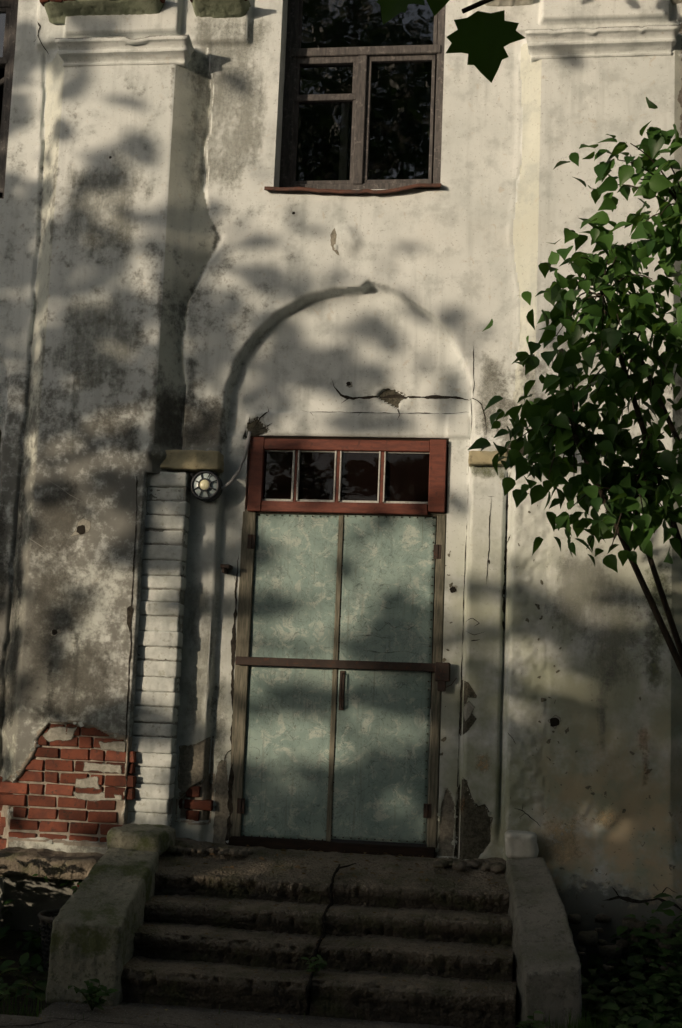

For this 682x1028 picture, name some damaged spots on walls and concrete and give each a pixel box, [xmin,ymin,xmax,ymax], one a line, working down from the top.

crack [332,348,487,474]
damp [0,476,111,724]
flaking render [0,720,137,850]
spalling [175,736,229,844]
spalling [451,778,493,860]
crack [304,863,356,1008]